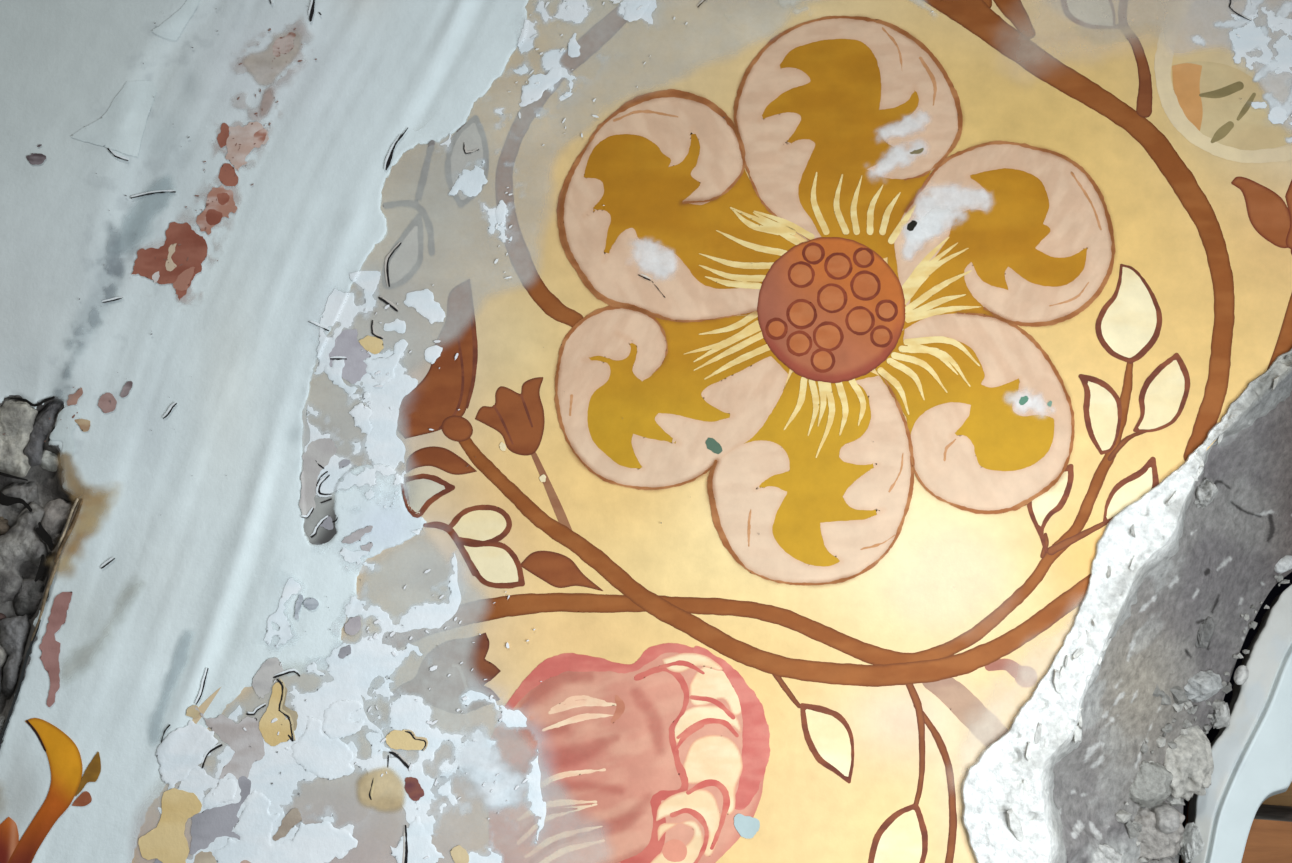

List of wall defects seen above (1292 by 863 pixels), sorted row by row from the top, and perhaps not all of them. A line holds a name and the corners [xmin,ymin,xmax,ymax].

peeling [519,33,580,107]
peeling [131,32,301,300]
peeling [448,166,488,197]
peeling [495,200,507,227]
peeling [98,381,133,413]
peeling [324,289,445,434]
peeling [299,438,373,552]
spalling [0,388,90,745]
peeling [294,594,319,620]
peeling [338,616,361,659]
spalling [961,348,1292,863]
peeling [138,657,469,863]